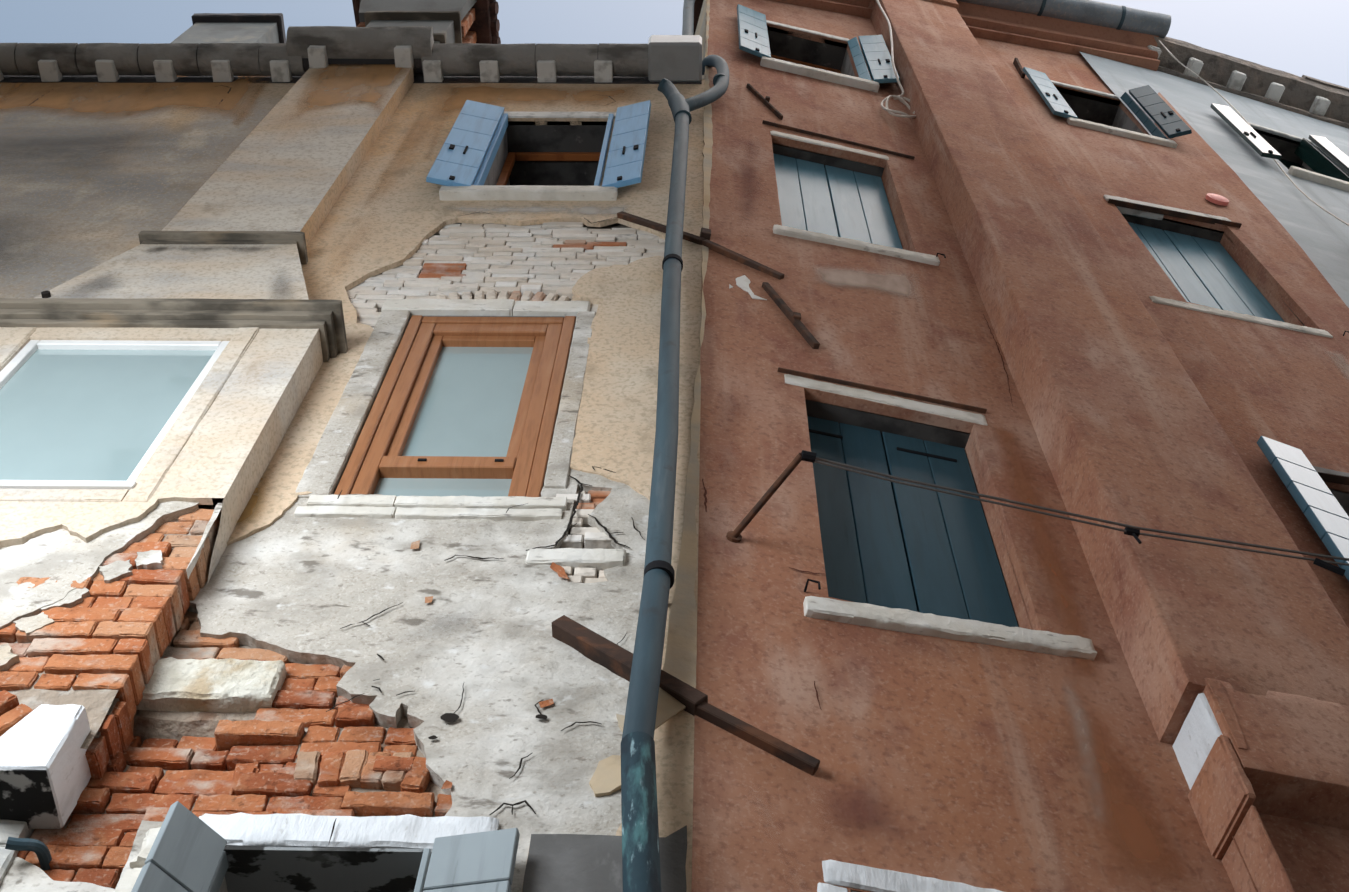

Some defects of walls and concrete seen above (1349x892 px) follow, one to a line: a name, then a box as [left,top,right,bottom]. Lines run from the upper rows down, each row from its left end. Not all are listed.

flaking render [347,222,665,329]
crack [444,466,645,561]
flaking render [0,469,650,892]